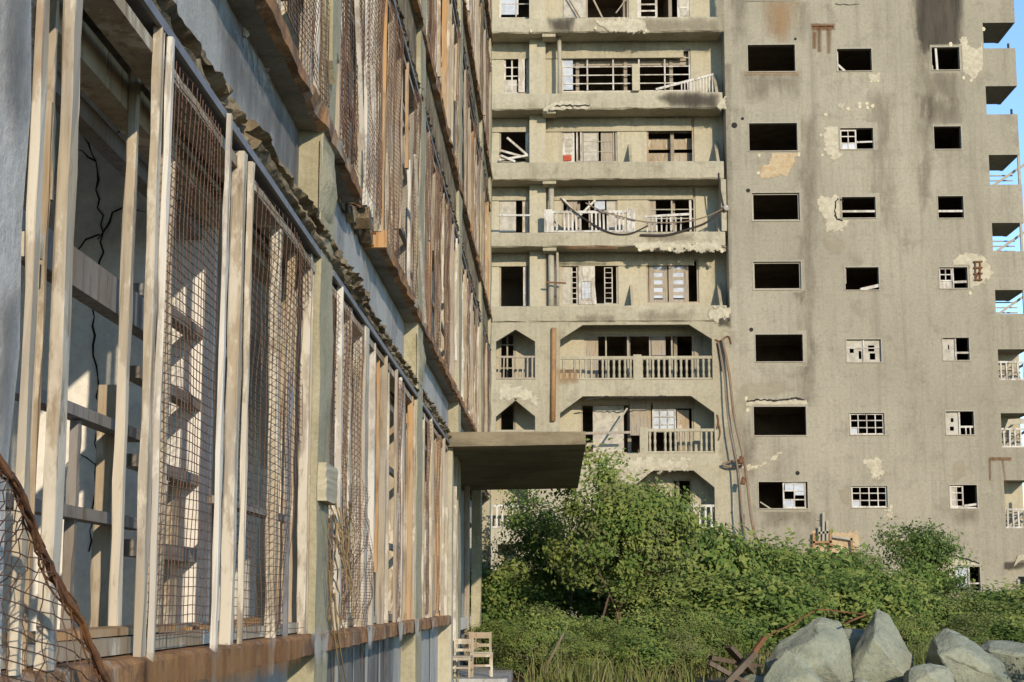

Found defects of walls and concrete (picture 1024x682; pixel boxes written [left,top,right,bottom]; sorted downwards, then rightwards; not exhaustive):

leakage [916,0,960,52]
spalling [949,27,985,82]
spalling [541,100,592,112]
spalling [820,113,845,160]
spalling [757,153,800,179]
crack [78,137,144,265]
spalling [816,194,850,233]
spalling [632,239,726,253]
spalling [952,252,994,295]
crack [91,310,99,399]
spalling [498,383,539,408]
crack [66,435,96,552]